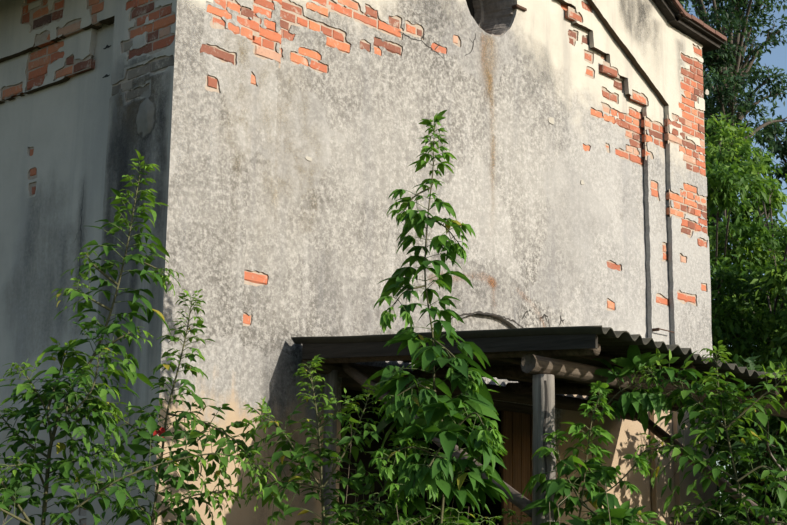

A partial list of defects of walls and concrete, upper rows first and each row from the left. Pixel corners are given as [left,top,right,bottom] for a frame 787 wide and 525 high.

flaking render [1,0,95,100]
flaking render [87,0,104,26]
flaking render [112,0,176,103]
flaking render [205,75,220,93]
flaking render [200,44,236,66]
flaking render [207,0,423,73]
crack [399,31,440,55]
flaking render [431,35,460,54]
flaking render [561,1,709,177]
flaking render [650,180,708,248]